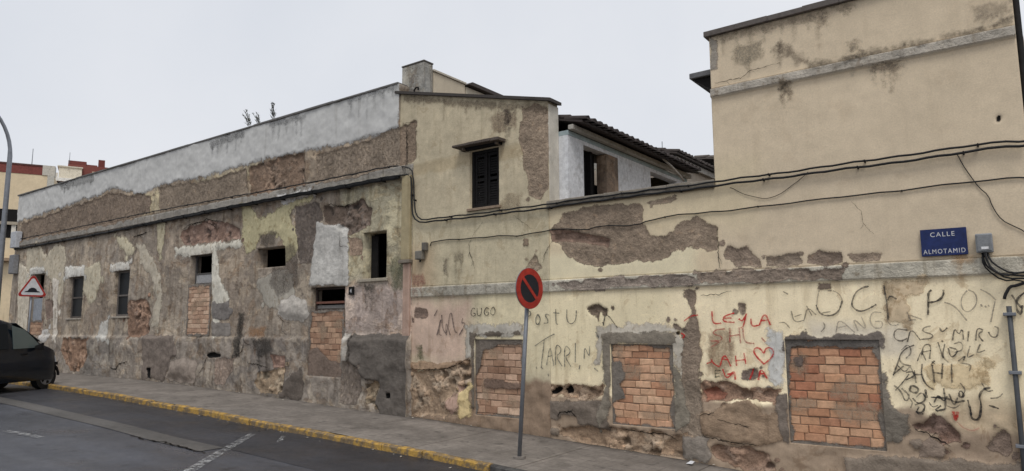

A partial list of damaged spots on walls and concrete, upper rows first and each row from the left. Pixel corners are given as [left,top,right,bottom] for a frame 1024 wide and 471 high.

spalling [17,120,417,346]
peeling [445,382,474,419]
spalling [518,102,549,201]
spalling [550,194,882,436]